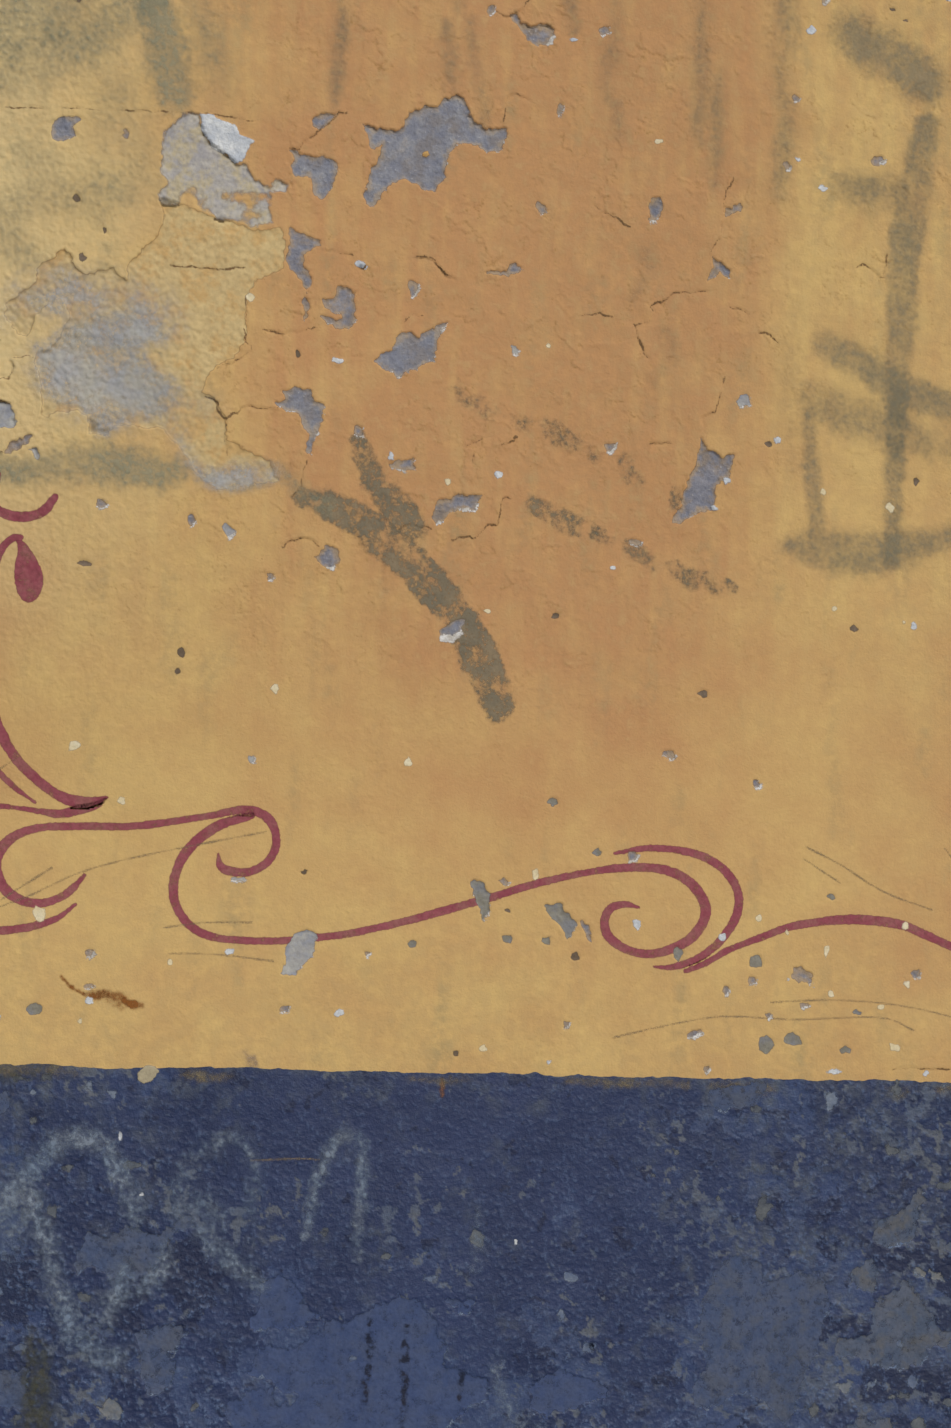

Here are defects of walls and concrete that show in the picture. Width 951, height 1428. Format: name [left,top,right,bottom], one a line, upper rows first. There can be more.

peeling [363,95,507,206]
peeling [0,112,357,489]
peeling [374,323,448,379]
peeling [672,438,734,524]
rust [61,976,143,1009]